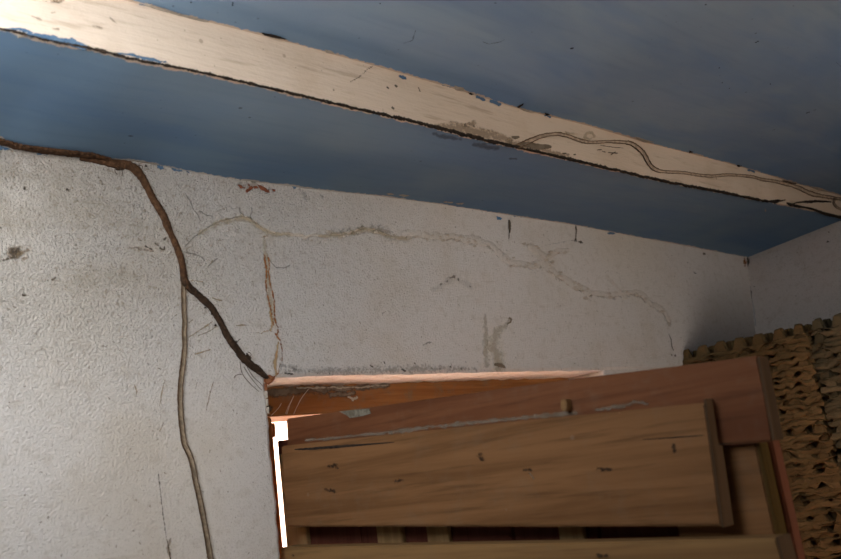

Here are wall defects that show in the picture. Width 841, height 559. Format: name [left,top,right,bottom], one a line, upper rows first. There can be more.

crack [0,28,841,221]
crack [0,138,269,559]